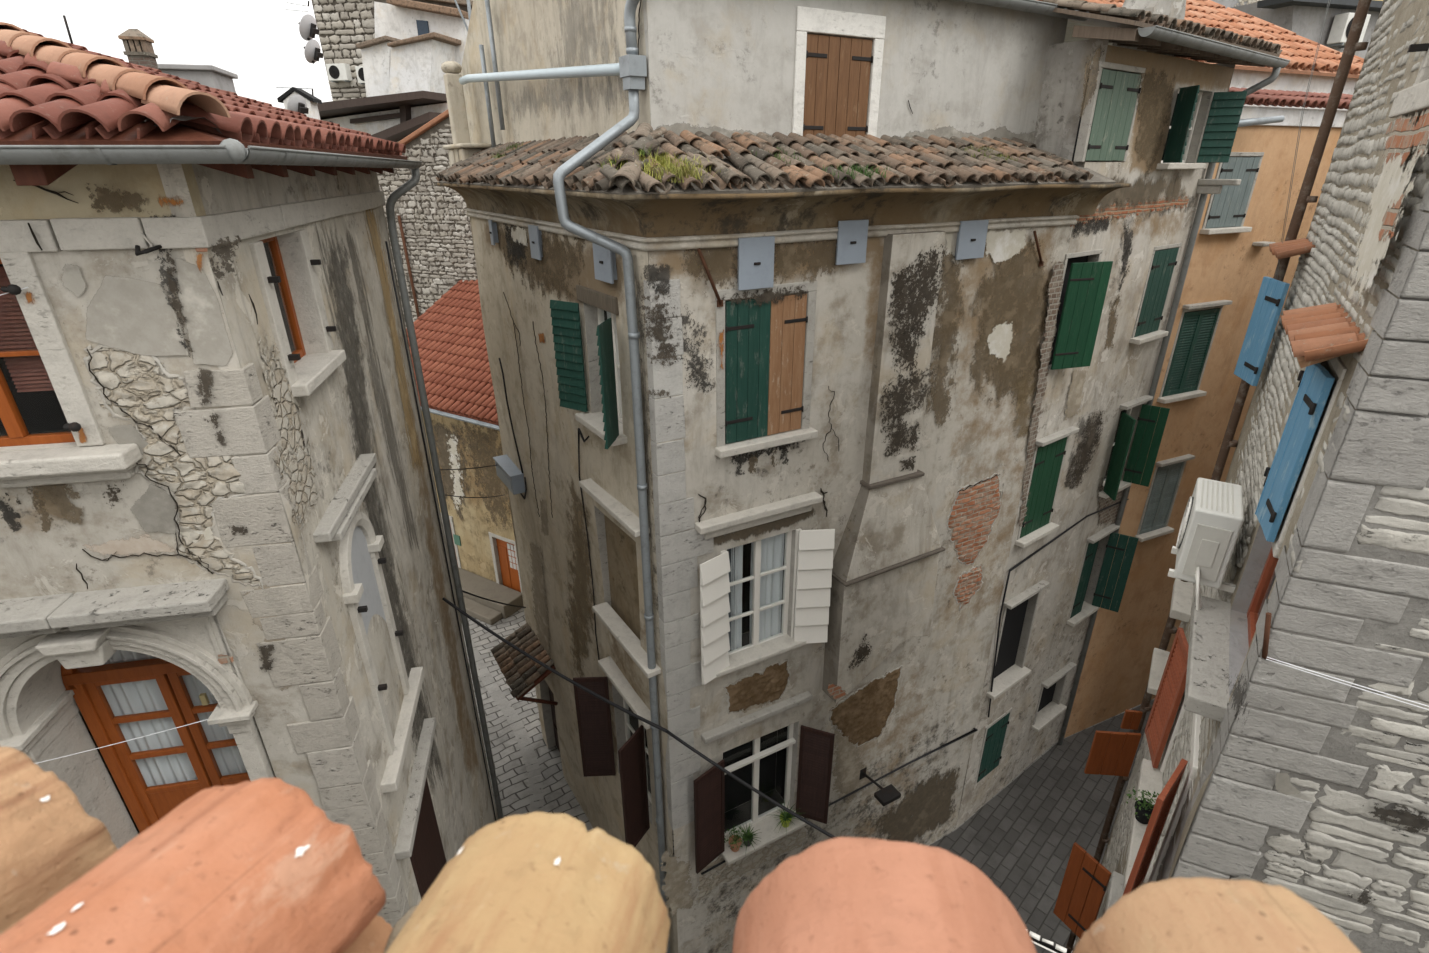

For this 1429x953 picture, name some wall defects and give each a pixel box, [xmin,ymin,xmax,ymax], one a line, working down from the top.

flaking render [1384,108,1429,166]
leakage [155,249,193,358]
peeling [258,334,320,528]
leakage [640,239,837,393]
crack [820,386,839,517]
leakage [879,238,1053,471]
flaking render [1018,259,1067,527]
leakage [1064,409,1105,489]
crack [76,533,213,589]
flaking render [946,473,1002,612]
flaking render [723,660,791,715]
flaking render [827,665,903,803]